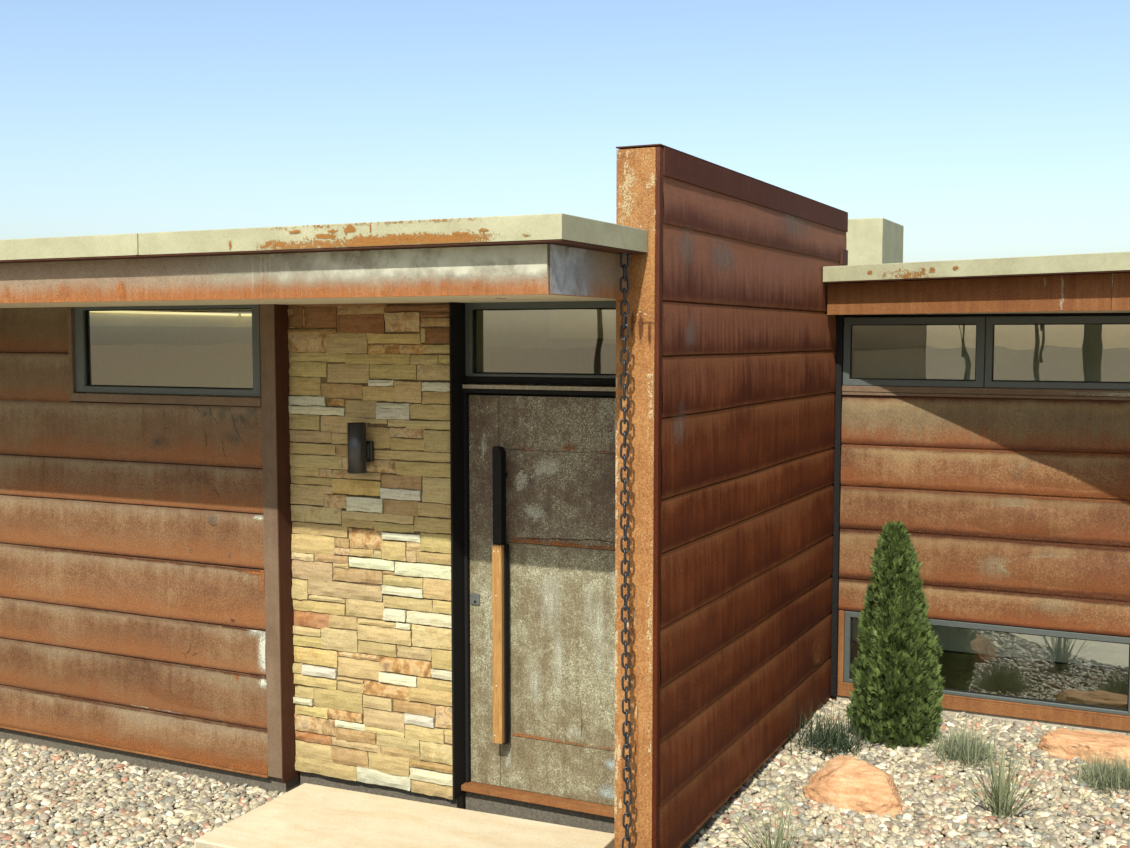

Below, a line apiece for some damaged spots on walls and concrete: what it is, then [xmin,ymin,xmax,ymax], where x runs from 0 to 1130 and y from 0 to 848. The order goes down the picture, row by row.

rust [616,150,655,234]
rust [867,267,939,279]
rust [0,278,459,303]
rust [622,313,655,343]
rust [908,529,1130,551]
rust [28,546,264,589]
rust [922,581,1130,606]
rust [184,619,265,633]
rust [117,654,266,679]
rust [14,688,267,733]